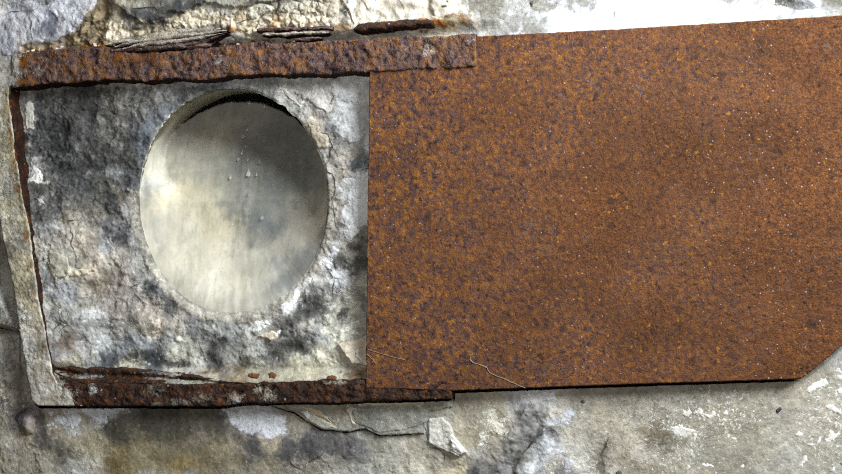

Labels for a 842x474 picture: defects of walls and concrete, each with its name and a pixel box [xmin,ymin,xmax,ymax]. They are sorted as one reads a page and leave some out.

rust [416,13,470,33]
leakage [312,75,370,147]
crack [60,190,83,268]
mould [328,236,367,275]
leakage [302,291,366,370]
rust [233,365,277,379]
crack [272,404,445,472]
leakage [476,405,575,474]